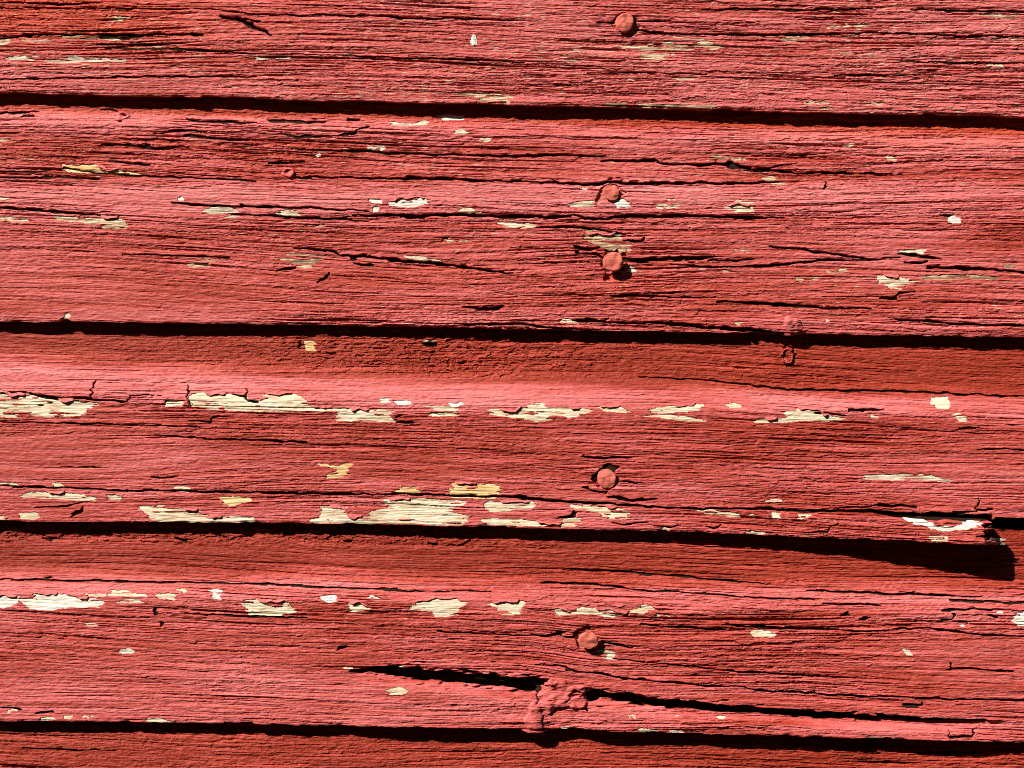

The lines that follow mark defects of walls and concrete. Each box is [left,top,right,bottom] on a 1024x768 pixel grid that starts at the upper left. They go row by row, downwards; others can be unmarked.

peeling [369,195,431,212]
peeling [0,390,99,418]
peeling [165,391,412,422]
peeling [487,402,706,422]
peeling [754,406,845,423]
peeling [137,496,257,523]
peeling [309,481,631,528]
peeling [902,517,983,542]
peeling [0,588,187,610]
peeling [241,598,297,616]
peeling [409,596,468,617]
crack [350,568,1024,764]